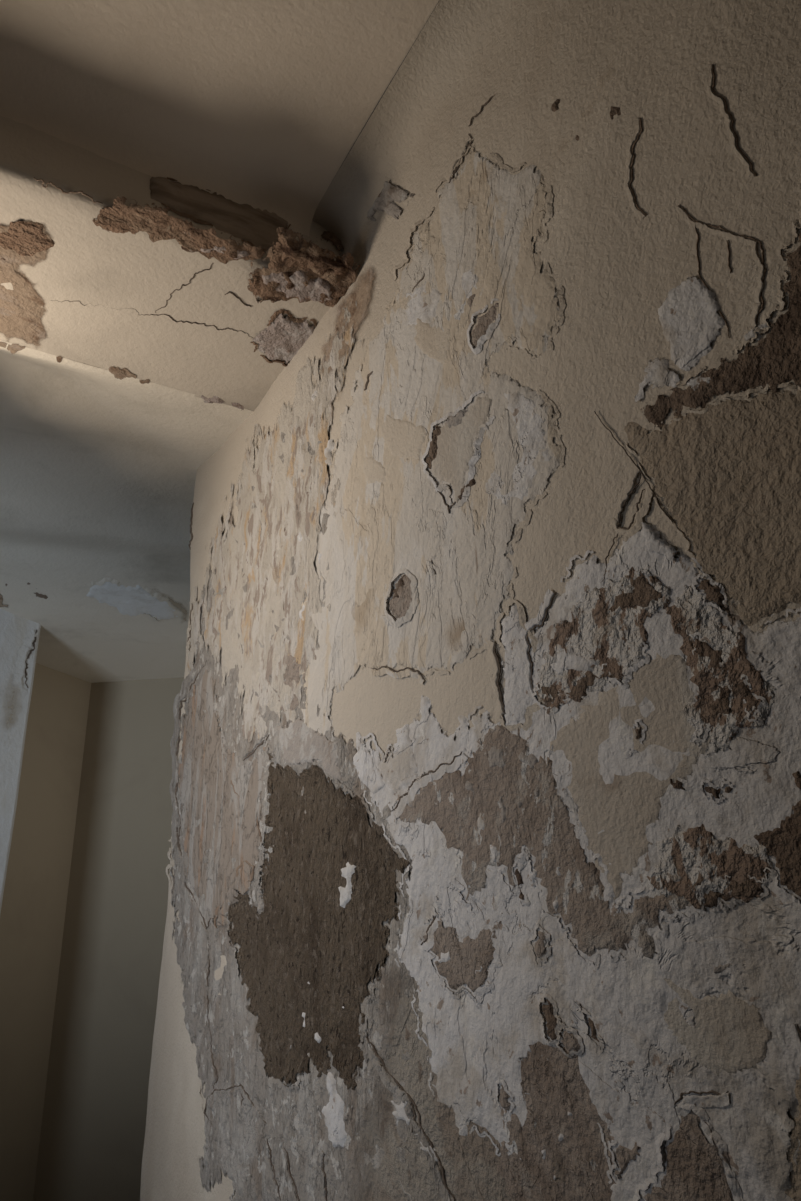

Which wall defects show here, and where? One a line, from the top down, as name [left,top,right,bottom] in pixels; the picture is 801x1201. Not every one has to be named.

crack [445,96,493,183]
crack [624,118,646,219]
crack [706,65,757,178]
flaking render [0,342,25,354]
crack [51,263,251,337]
crack [675,205,766,347]
crack [437,491,456,514]
peeling [86,146,801,1201]
crack [359,1032,455,1201]